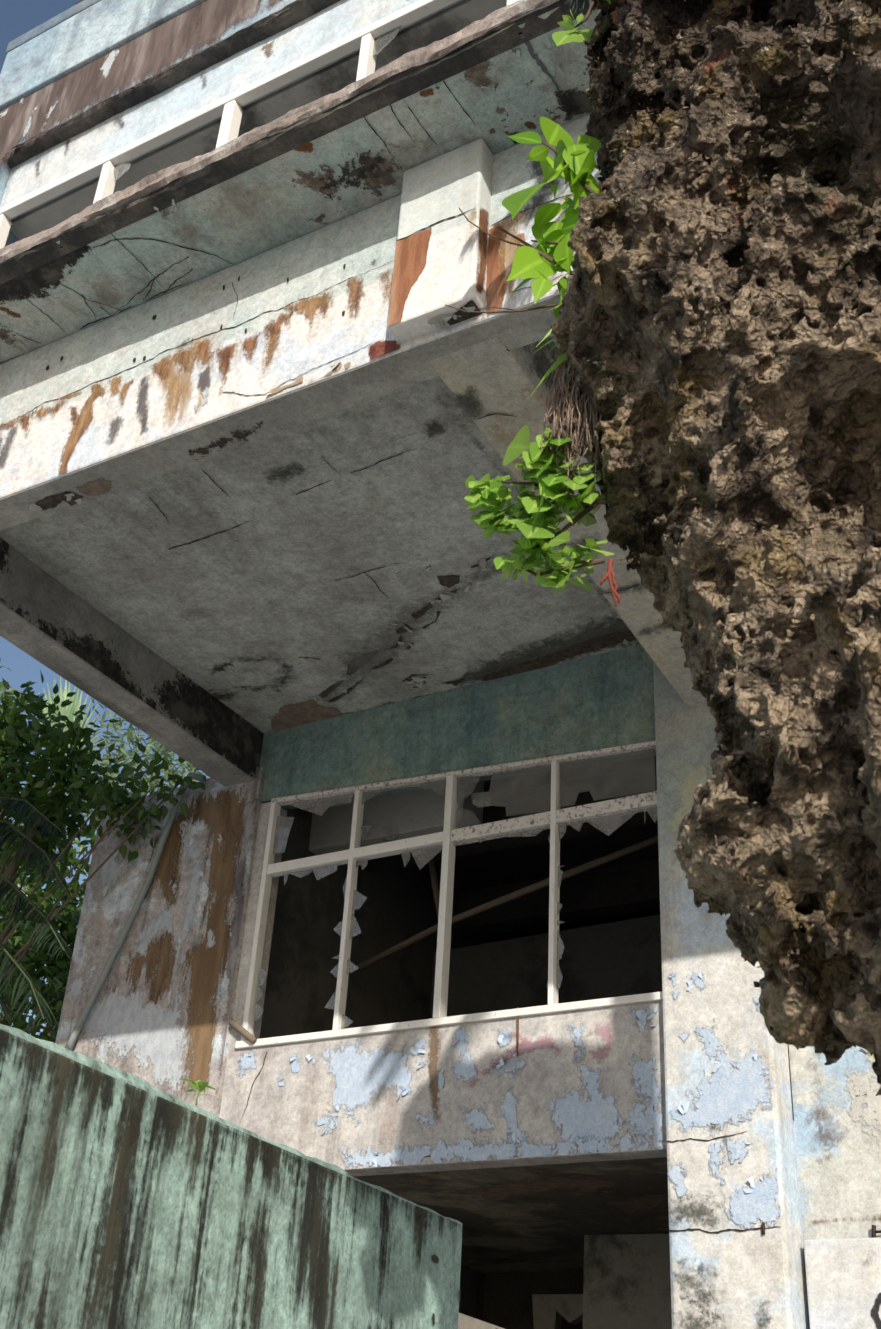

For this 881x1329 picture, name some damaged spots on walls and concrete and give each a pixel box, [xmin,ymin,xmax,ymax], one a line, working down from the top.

damp [0,0,280,166]
rust [152,293,331,422]
crack [0,194,572,427]
rust [368,227,431,359]
rust [0,377,133,475]
crack [149,470,256,550]
crack [296,448,417,495]
damp [0,564,500,779]
peeling [135,821,222,957]
peeling [65,963,192,1095]
damp [0,1029,461,1329]
peeling [277,1018,781,1229]